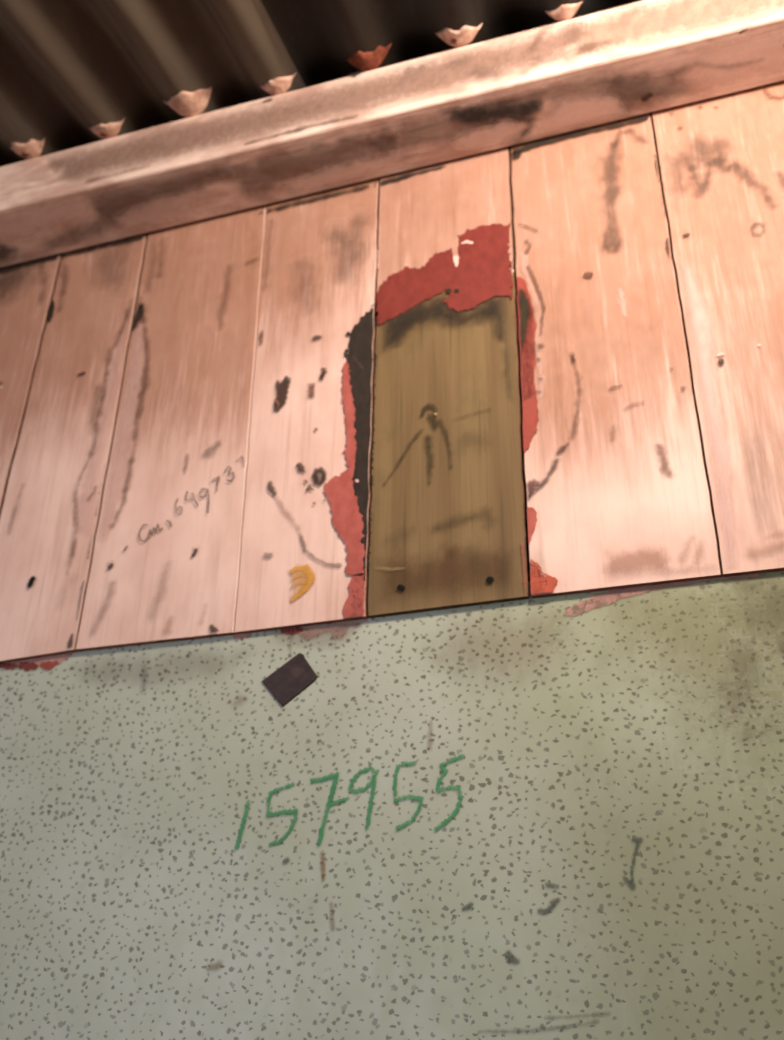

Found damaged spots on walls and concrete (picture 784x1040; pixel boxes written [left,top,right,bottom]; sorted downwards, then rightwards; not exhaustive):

peeling [296,223,545,618]
peeling [521,479,558,594]